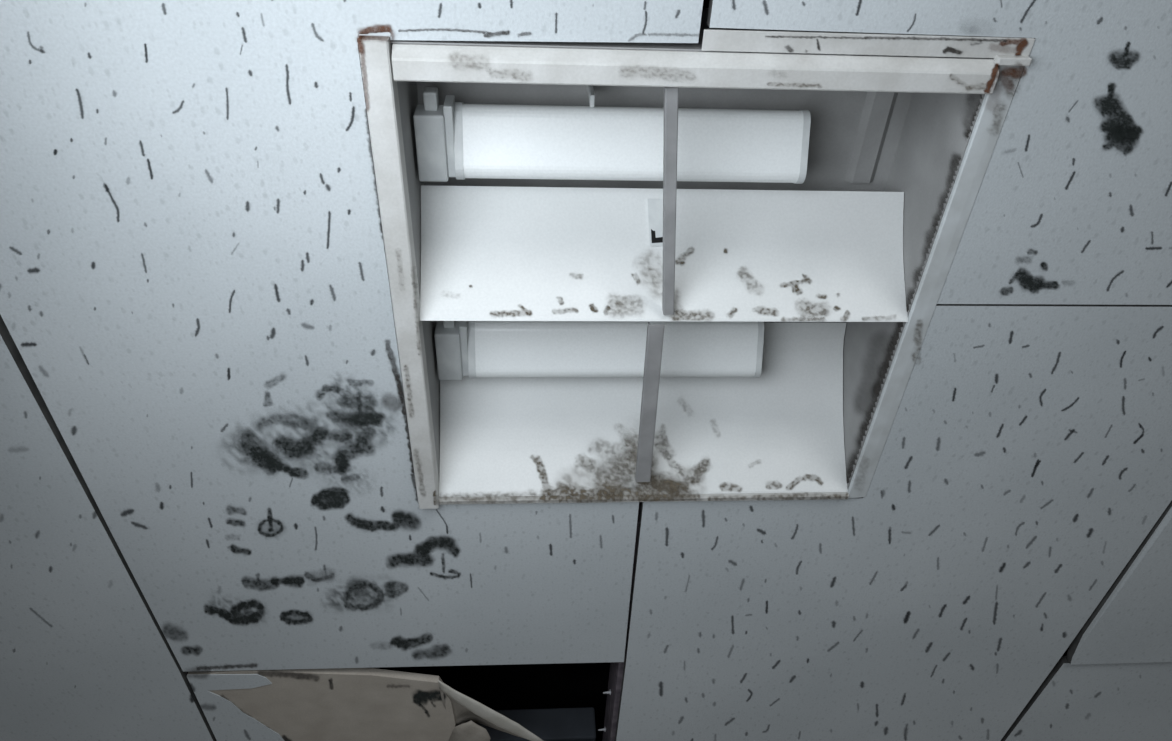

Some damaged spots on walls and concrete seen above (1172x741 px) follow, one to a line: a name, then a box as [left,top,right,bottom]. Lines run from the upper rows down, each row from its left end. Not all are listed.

rust [357,25,391,53]
rust [984,38,1028,93]
water stain [1110,42,1139,69]
water stain [1095,83,1142,154]
water stain [1001,249,1058,295]
water stain [240,381,419,531]
water stain [258,509,283,537]
water stain [389,537,460,579]
water stain [205,569,332,625]
water stain [333,581,408,611]
water stain [164,627,333,689]
water stain [391,635,449,658]